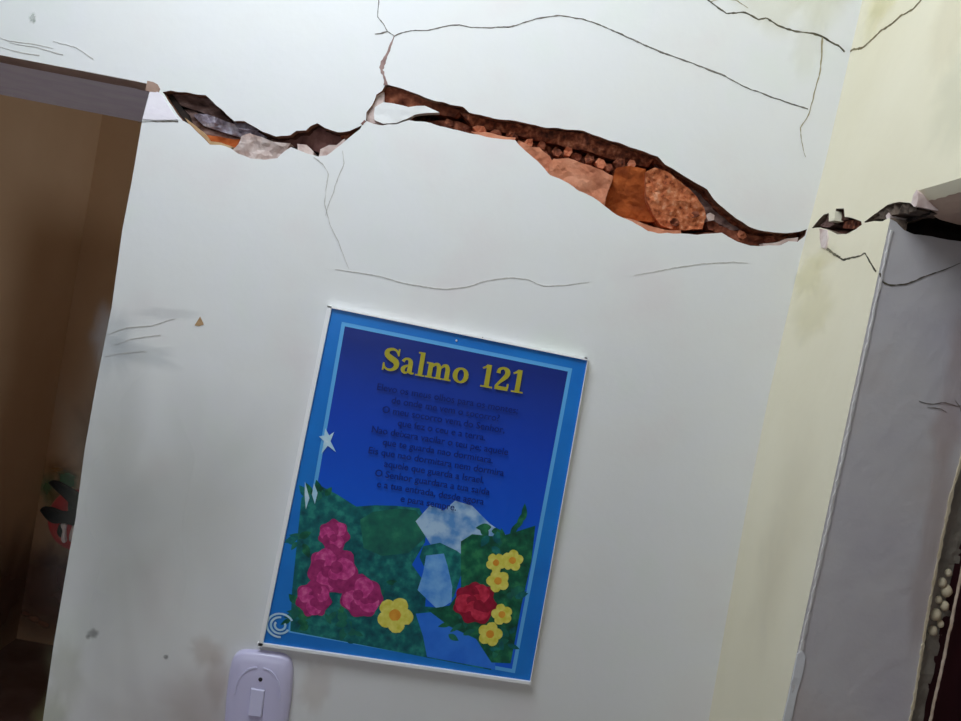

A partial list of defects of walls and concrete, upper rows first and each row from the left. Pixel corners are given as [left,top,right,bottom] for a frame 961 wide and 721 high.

crack [138,0,960,289]